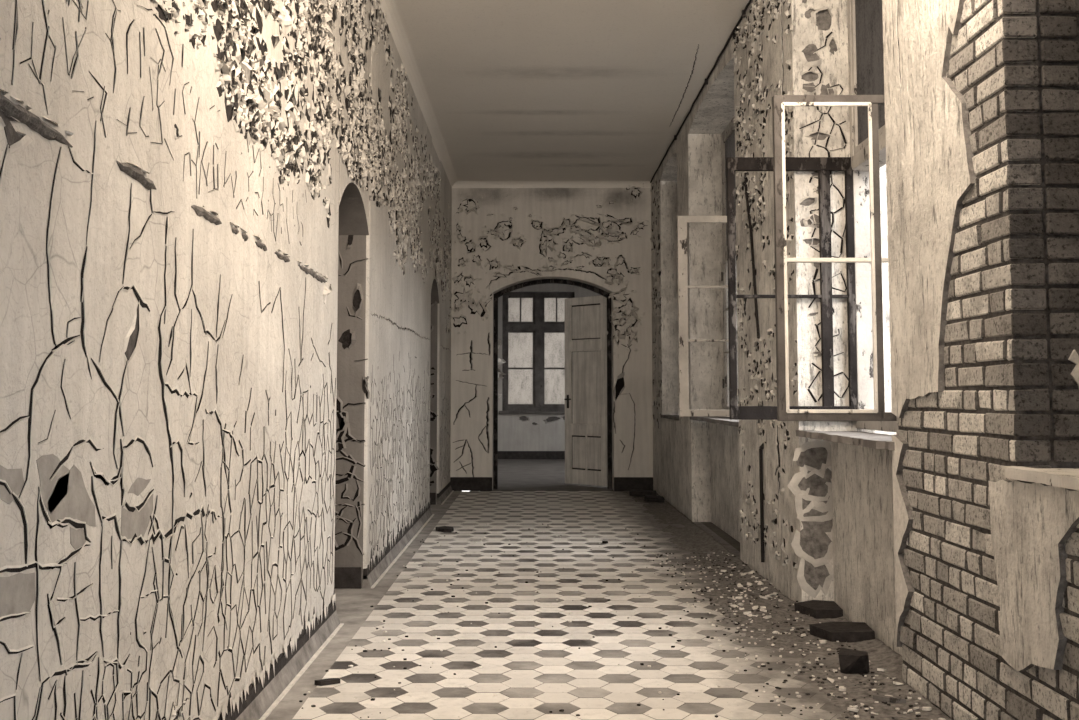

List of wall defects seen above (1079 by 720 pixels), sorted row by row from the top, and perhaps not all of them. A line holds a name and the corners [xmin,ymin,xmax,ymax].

flaking render [0,110,33,154]
crack [0,0,491,720]
peeling [150,0,662,428]
peeling [735,171,777,406]
peeling [732,0,837,157]
peeling [786,171,820,285]
spalling [899,0,977,418]
peeling [36,454,96,550]
flaking render [698,565,827,646]
peeling [738,420,834,598]
spalling [892,434,915,647]
spalling [1054,517,1079,670]